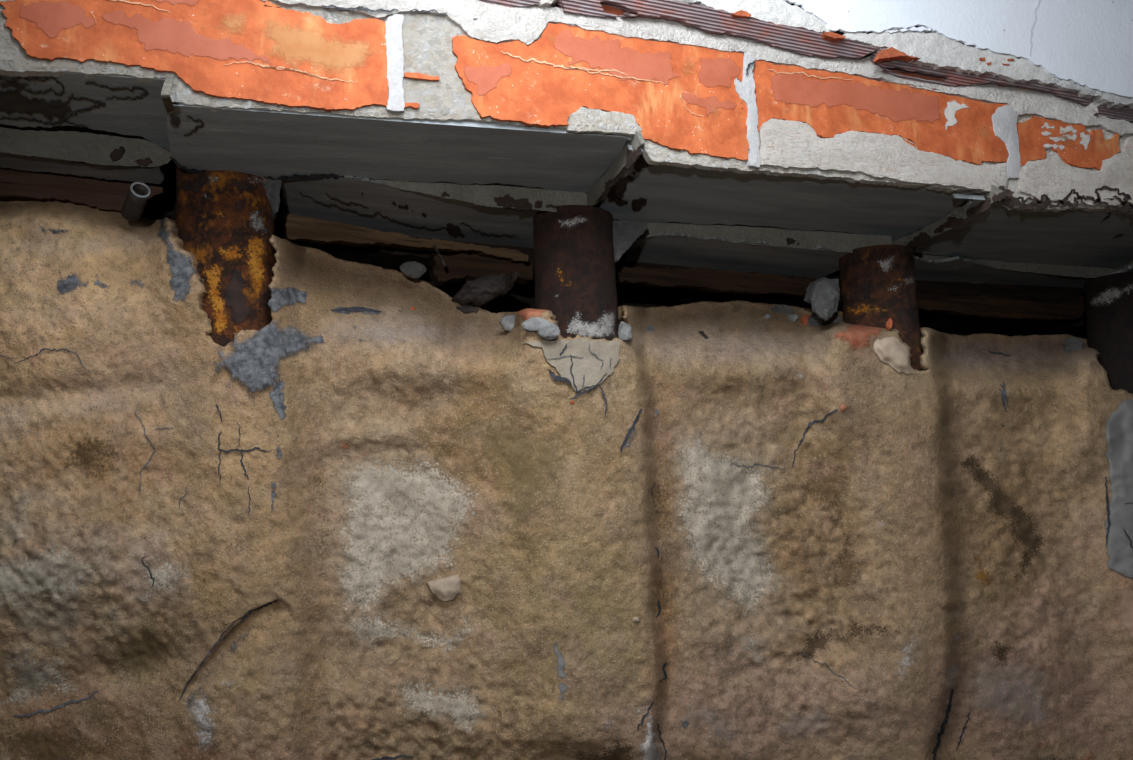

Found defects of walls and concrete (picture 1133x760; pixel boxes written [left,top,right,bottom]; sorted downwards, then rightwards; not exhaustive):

flaking render [0,0,389,112]
flaking render [404,72,440,81]
flaking render [452,23,1120,171]
flaking render [671,0,1133,109]
peeling [214,287,324,419]
crack [216,404,271,515]
damp [321,444,477,652]
damp [656,432,780,662]
damp [802,467,860,588]
damp [391,681,519,737]